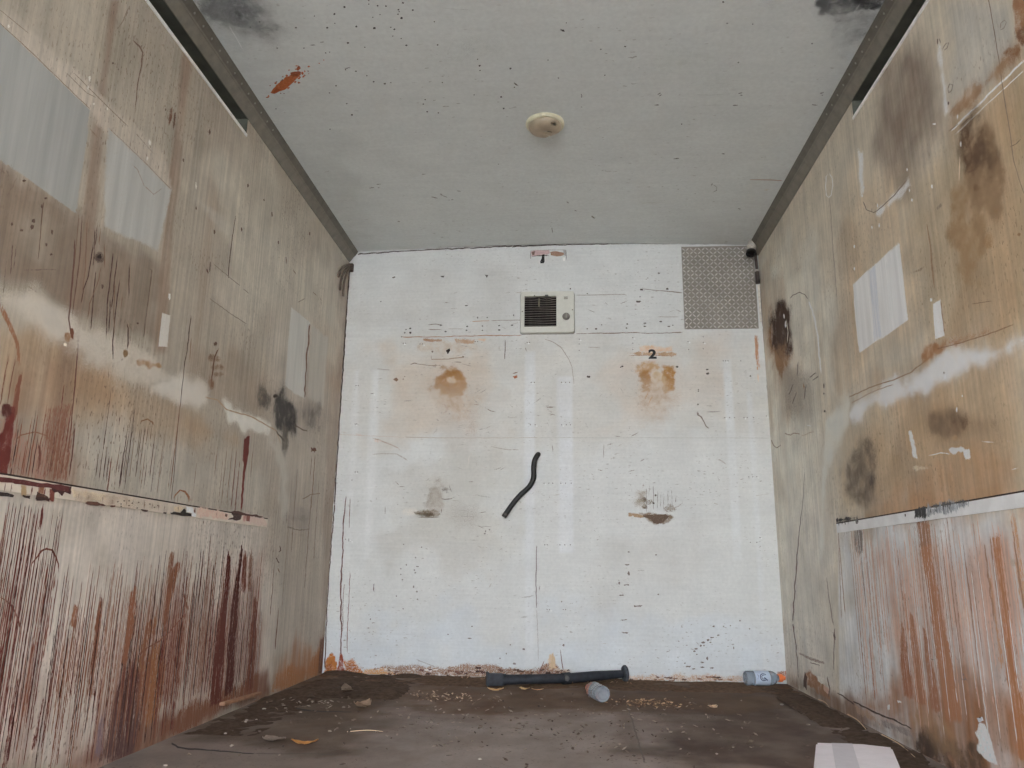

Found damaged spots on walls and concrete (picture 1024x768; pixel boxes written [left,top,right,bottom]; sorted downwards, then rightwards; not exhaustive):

rust [266,59,324,98]
water stain [944,0,1024,292]
water stain [207,342,224,392]
rust [394,338,496,426]
rust [627,345,689,435]
water stain [920,323,1013,366]
rust [0,216,400,768]
water stain [836,434,881,511]
water stain [908,403,1005,471]
rust [850,510,1024,762]